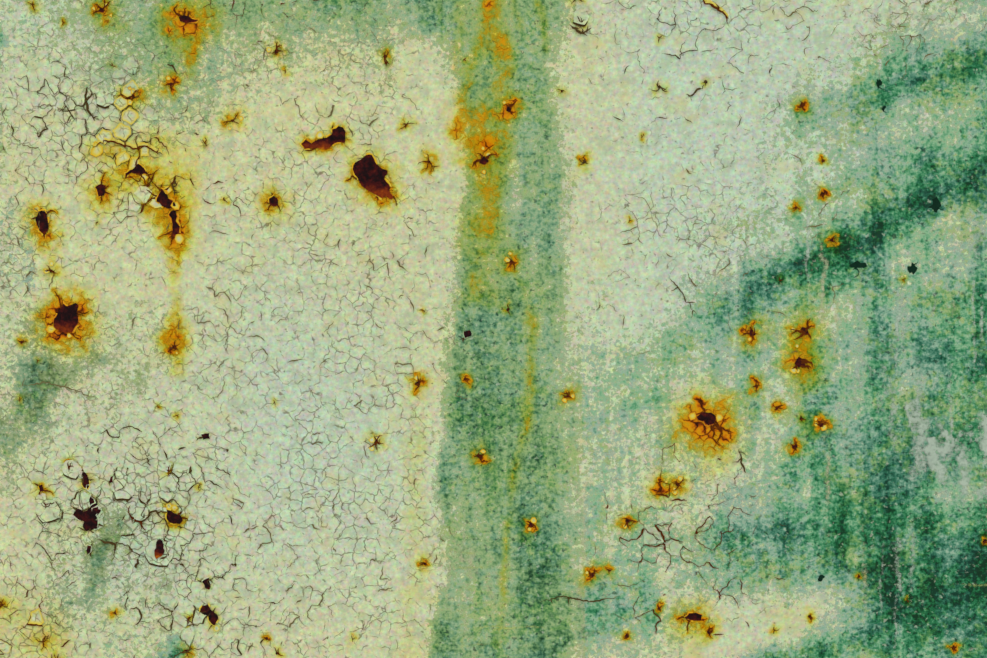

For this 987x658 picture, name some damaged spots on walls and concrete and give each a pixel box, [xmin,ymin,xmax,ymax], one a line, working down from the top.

crack [569,0,987,164]
corrosion [449,97,523,234]
crack [596,128,854,330]
corrosion [160,321,185,355]
crack [0,0,468,658]
corrosion [738,320,757,346]
corrosion [783,318,815,376]
corrosion [748,375,762,394]
peeling [58,460,83,480]
peeling [36,493,60,528]
peeling [108,471,150,524]
peeling [138,531,180,570]